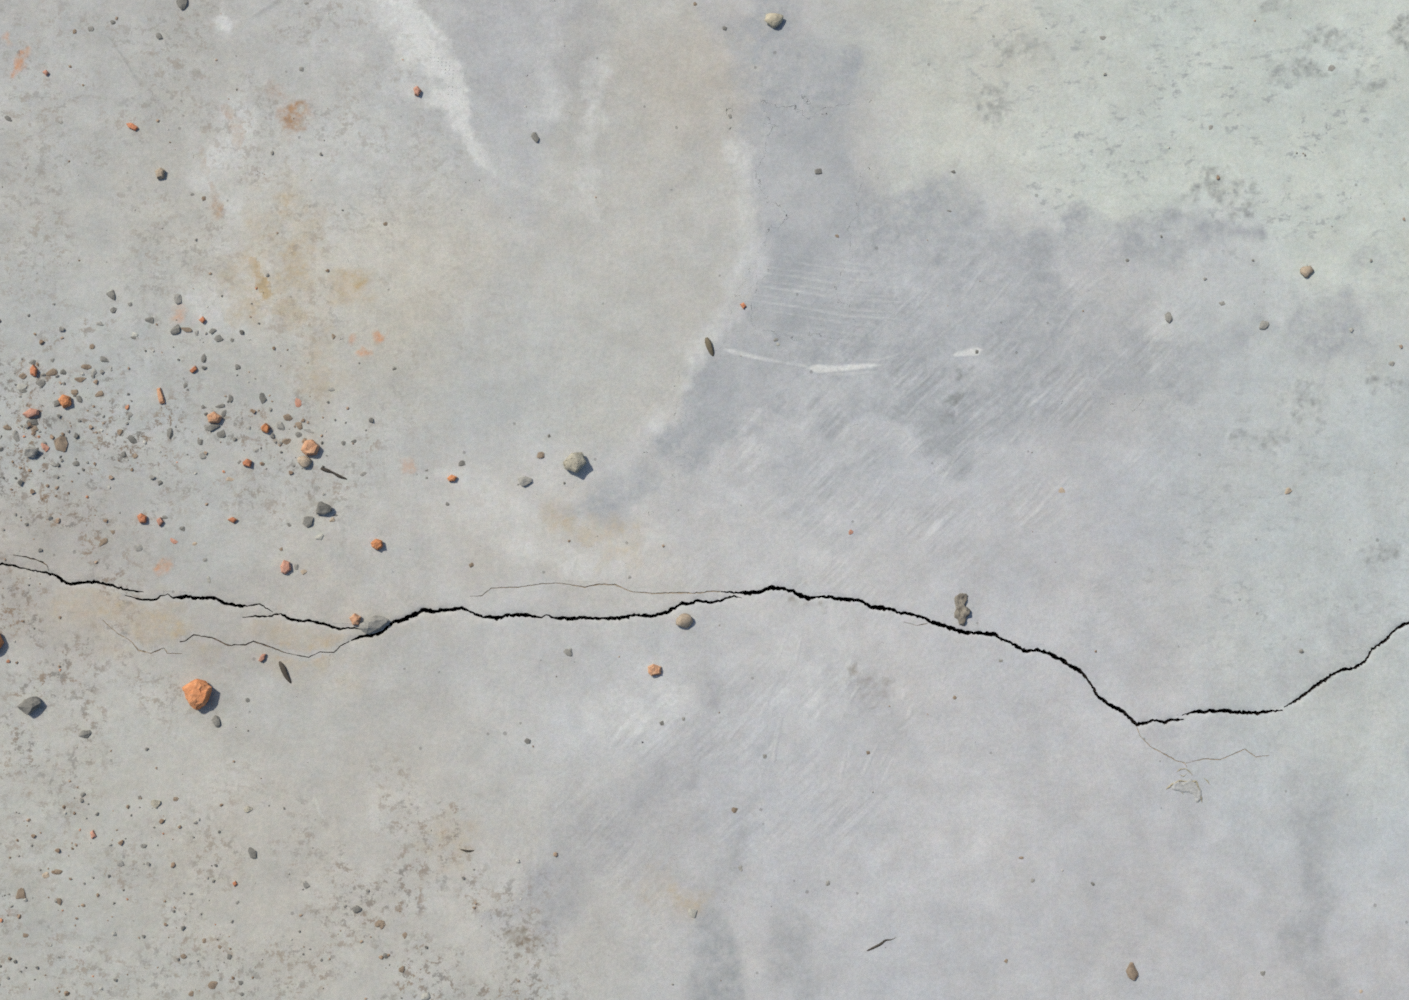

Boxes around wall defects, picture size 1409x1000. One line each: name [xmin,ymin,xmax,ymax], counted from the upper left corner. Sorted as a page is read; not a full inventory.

crack [0,555,1409,767]